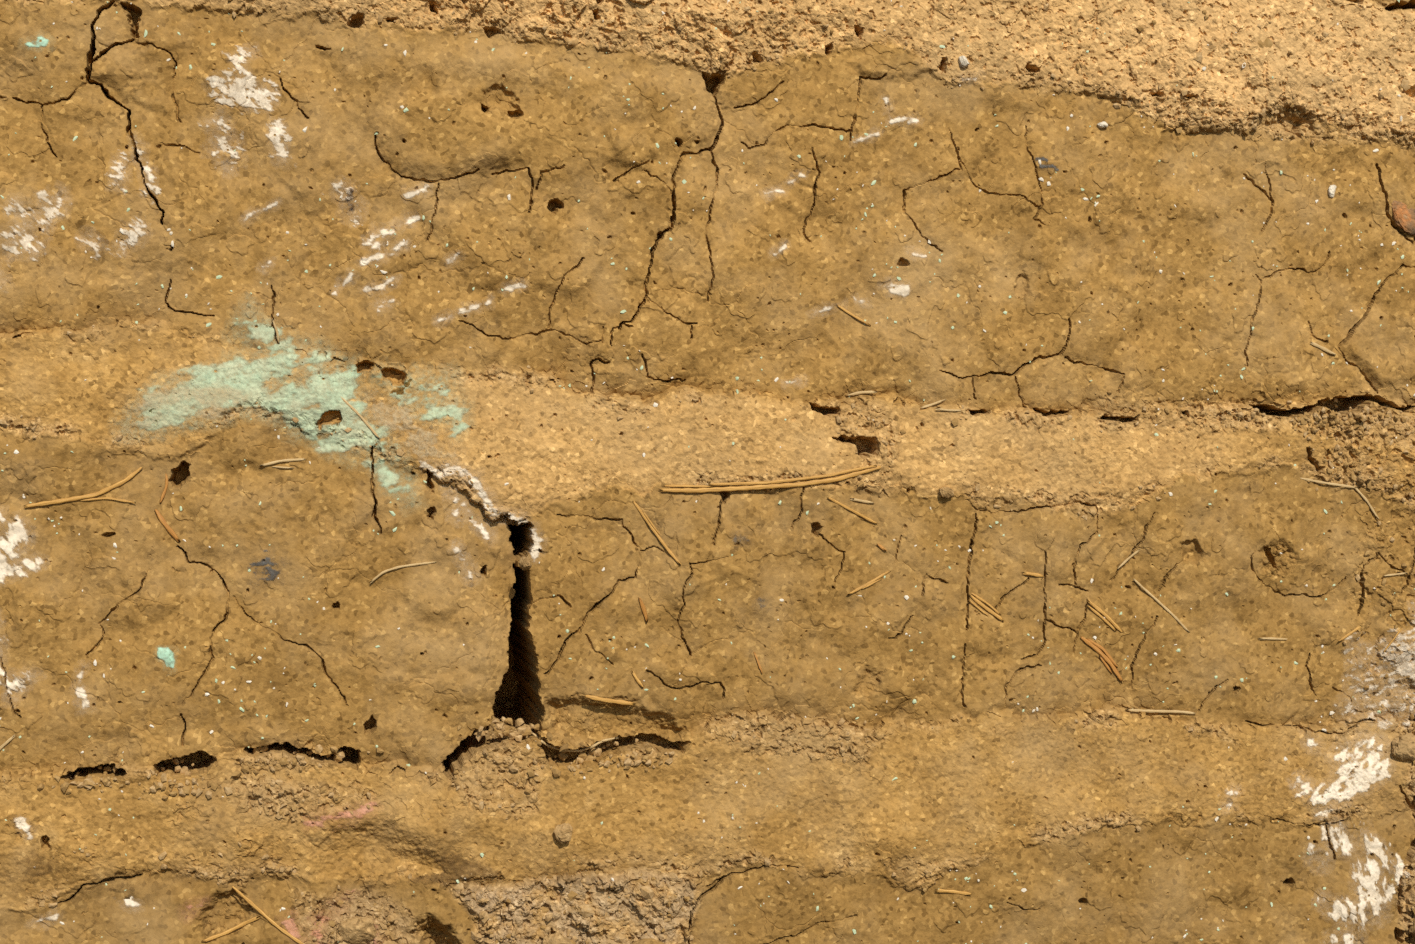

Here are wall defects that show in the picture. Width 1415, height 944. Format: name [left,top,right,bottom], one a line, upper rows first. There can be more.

crack [12,0,200,225]
crack [280,80,309,119]
crack [164,279,215,318]
crack [374,132,567,242]
crack [458,72,887,398]
crack [902,125,1046,253]
crack [939,318,1125,409]
crack [1243,163,1275,233]
crack [1244,251,1331,367]
crack [1307,163,1415,407]
crack [85,546,349,747]
crack [528,499,729,699]